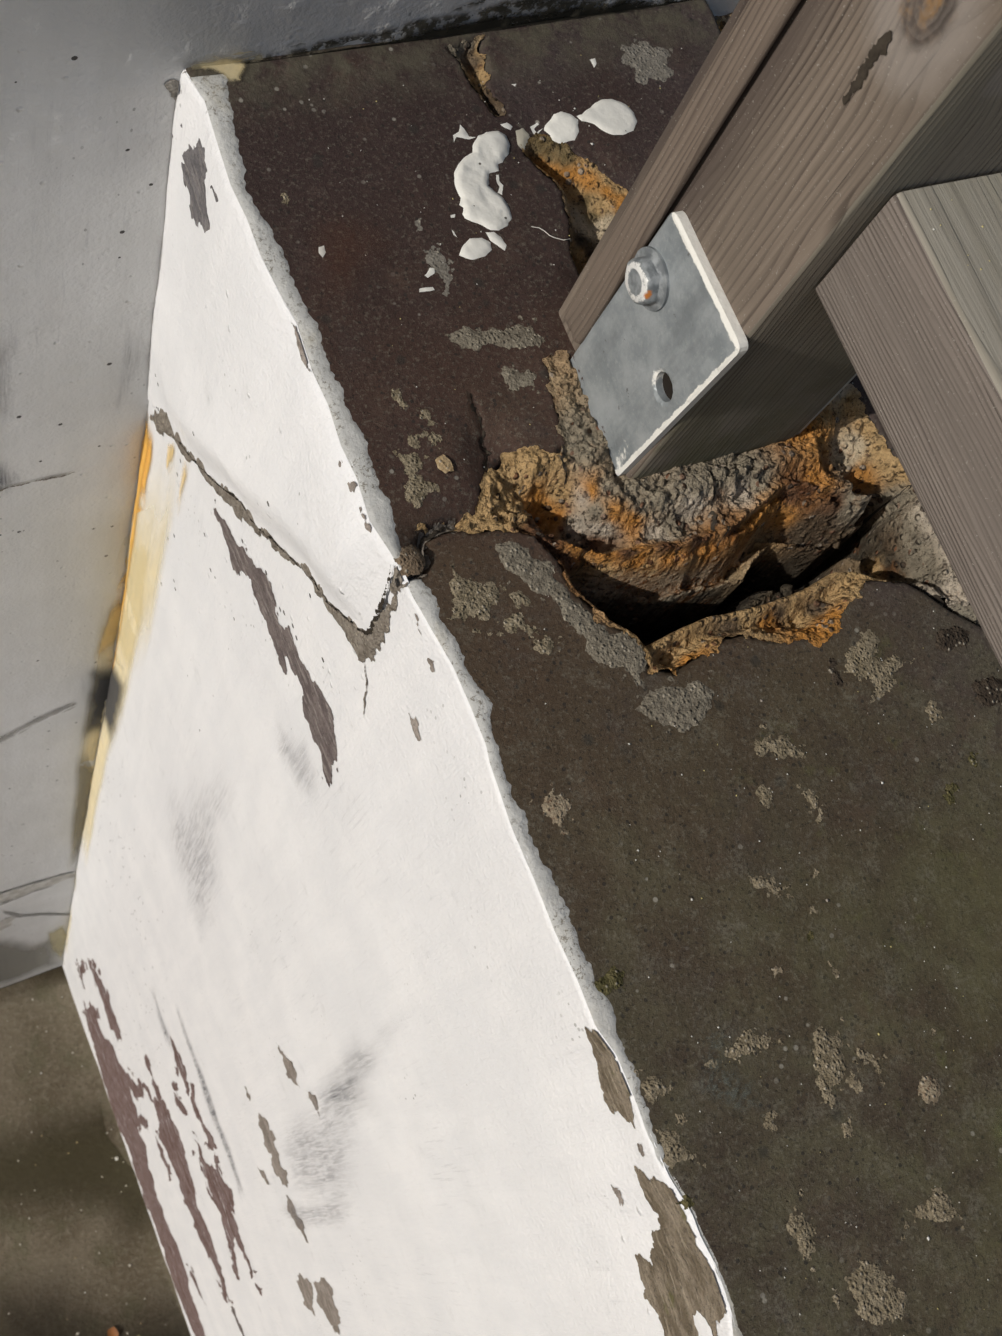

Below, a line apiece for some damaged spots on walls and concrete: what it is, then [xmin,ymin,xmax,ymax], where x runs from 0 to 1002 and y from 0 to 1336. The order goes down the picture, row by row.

peeling [181,138,218,233]
spalling [390,316,981,733]
peeling [213,500,338,787]
peeling [278,1045,320,1117]
peeling [704,1028,784,1069]
peeling [811,1017,888,1138]
peeling [75,959,262,1336]
peeling [258,1114,308,1243]
peeling [584,1027,726,1336]
peeling [785,1189,830,1272]
peeling [297,1273,340,1334]
peeling [832,1258,907,1336]